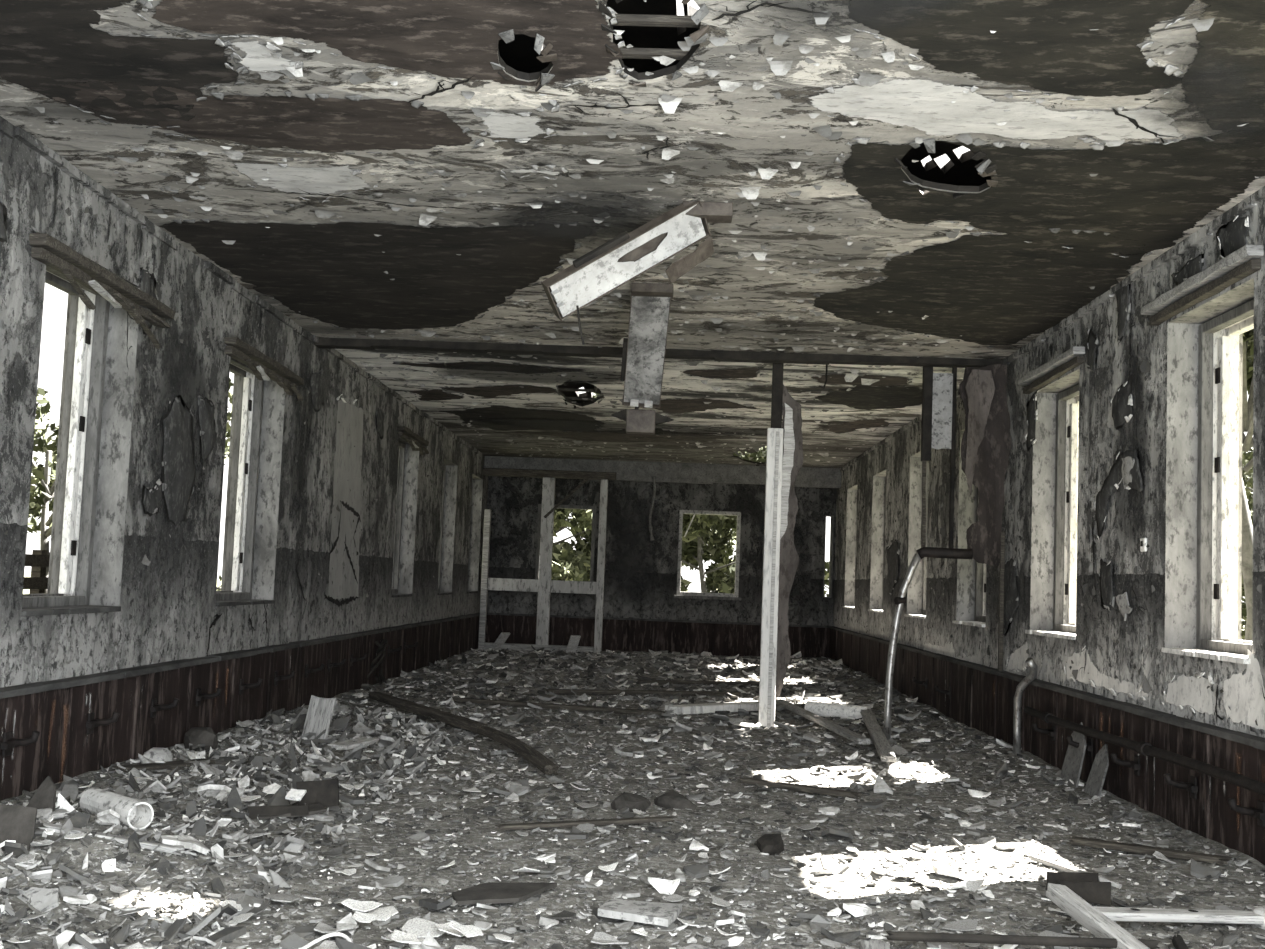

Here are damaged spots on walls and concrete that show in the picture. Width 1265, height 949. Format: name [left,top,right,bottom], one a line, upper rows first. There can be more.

peeling [0,0,626,203]
peeling [808,0,1265,347]
peeling [0,196,10,246]
peeling [138,267,160,335]
peeling [159,219,584,331]
peeling [1087,327,1098,371]
peeling [1111,374,1133,430]
peeling [142,395,196,528]
peeling [1094,447,1145,540]
peeling [996,558,1019,636]
spalling [1006,641,1028,673]